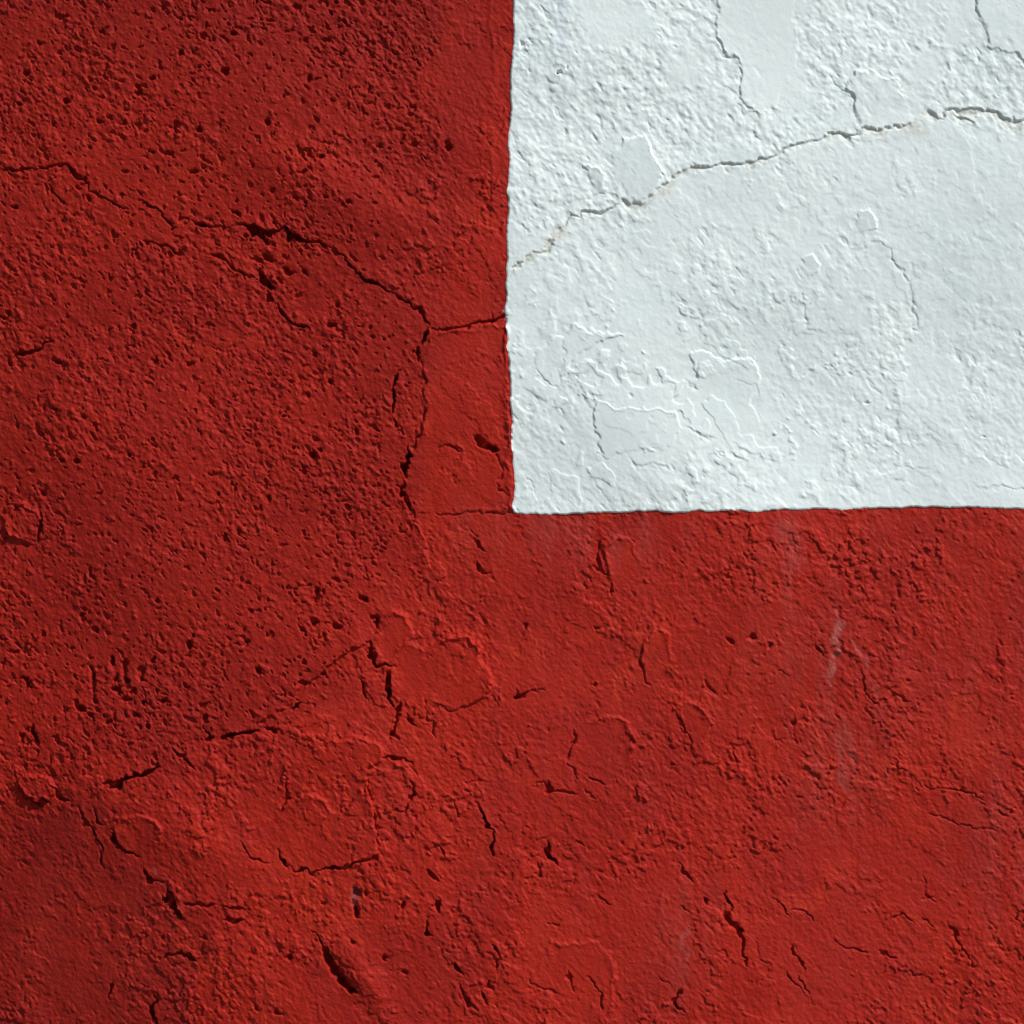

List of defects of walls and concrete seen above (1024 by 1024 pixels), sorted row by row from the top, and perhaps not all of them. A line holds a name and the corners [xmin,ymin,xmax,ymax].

crack [506,29,1024,276]
crack [0,156,514,525]
crack [512,683,552,701]
crack [16,685,308,965]
crack [239,611,486,878]
crack [452,768,503,864]
crack [529,728,612,804]
crack [423,836,457,939]
crack [452,938,610,1017]
crack [595,885,616,907]
crack [676,860,984,1010]